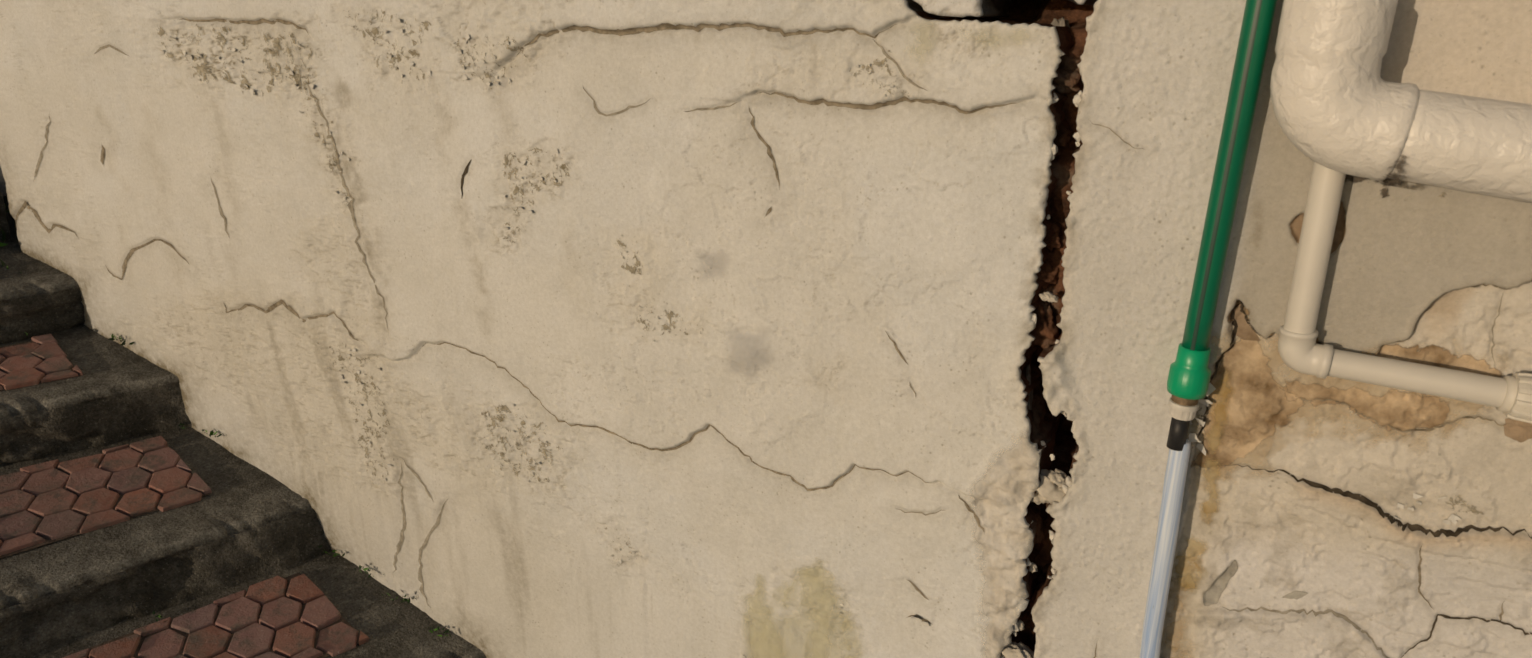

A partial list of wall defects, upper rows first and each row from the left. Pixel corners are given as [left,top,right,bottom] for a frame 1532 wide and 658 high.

crack [15,117,77,236]
crack [107,239,189,280]
crack [180,18,388,341]
crack [461,160,471,198]
crack [423,342,985,532]
crack [518,23,1015,216]
crack [938,0,1143,658]
spalling [1187,300,1450,468]
spalling [1374,341,1502,378]
spalling [1504,418,1532,442]
crack [393,459,448,606]
crack [1221,465,1532,658]